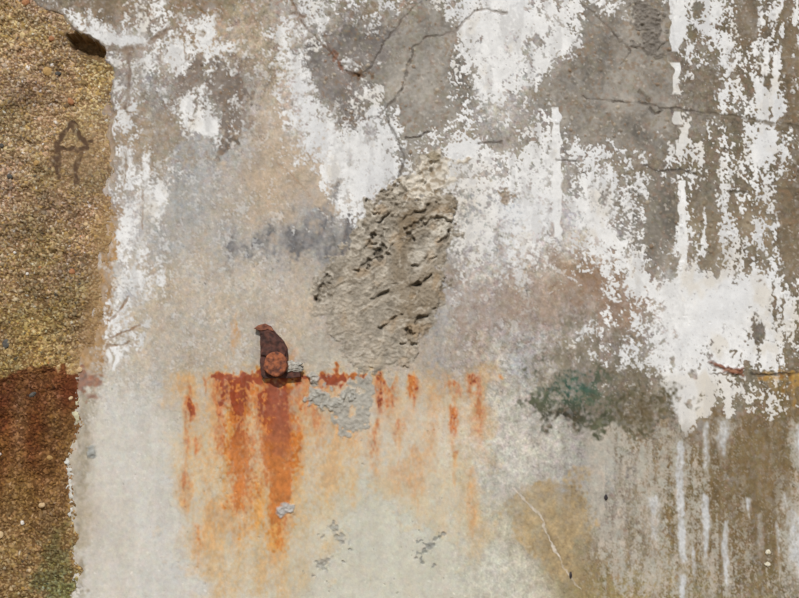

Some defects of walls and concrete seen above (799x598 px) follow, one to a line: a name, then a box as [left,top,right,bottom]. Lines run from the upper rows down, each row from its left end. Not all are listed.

crack [289,0,421,79]
crack [384,7,509,178]
crack [582,87,799,131]
spalling [0,0,799,437]
corrosion [0,359,115,598]
spalling [71,571,83,598]
corrosion [156,309,507,598]
damp [503,381,799,598]